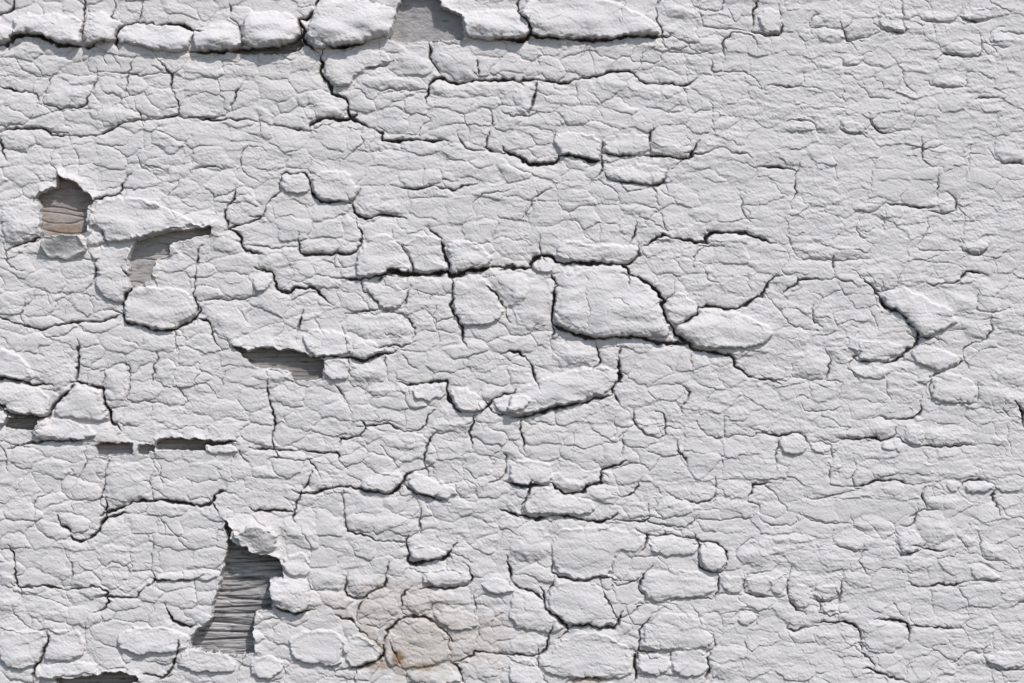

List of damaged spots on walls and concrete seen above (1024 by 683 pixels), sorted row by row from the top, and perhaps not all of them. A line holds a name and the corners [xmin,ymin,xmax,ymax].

peeling [385,0,466,46]
peeling [33,171,96,240]
crack [0,339,162,432]
peeling [93,434,239,458]
peeling [125,224,213,290]
peeling [230,344,327,385]
crack [0,0,844,414]
crack [229,294,1024,683]
crack [782,235,944,382]
crack [806,0,1024,288]
crack [0,439,227,683]
peeling [187,519,285,658]